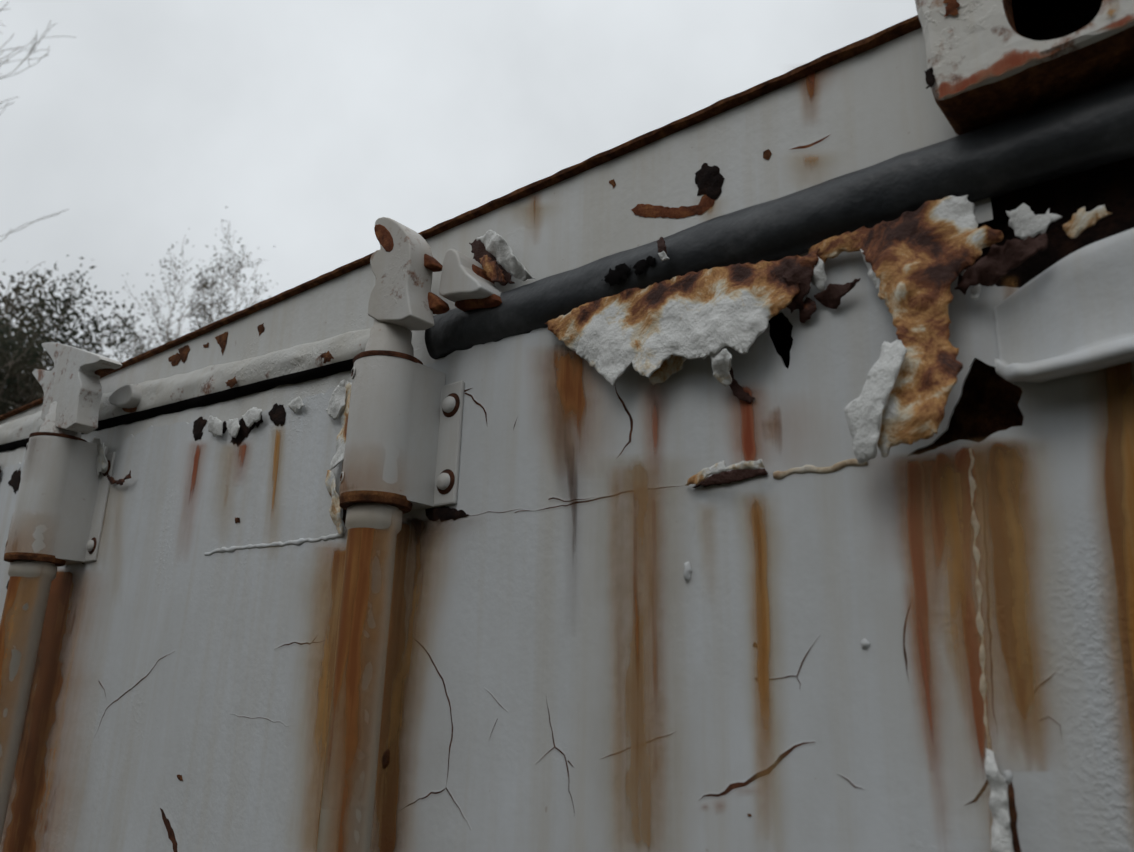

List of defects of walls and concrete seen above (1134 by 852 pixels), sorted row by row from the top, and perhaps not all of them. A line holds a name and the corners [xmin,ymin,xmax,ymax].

corrosion [631,163,725,219]
peeling [545,194,1112,464]
peeling [193,396,304,447]
peeling [325,379,352,535]
crack [613,381,636,460]
peeling [684,459,768,488]
corrosion [906,442,1037,763]
corrosion [1104,362,1134,774]
corrosion [0,571,77,852]
crack [397,632,472,831]
crack [535,694,676,818]
crack [698,740,816,802]